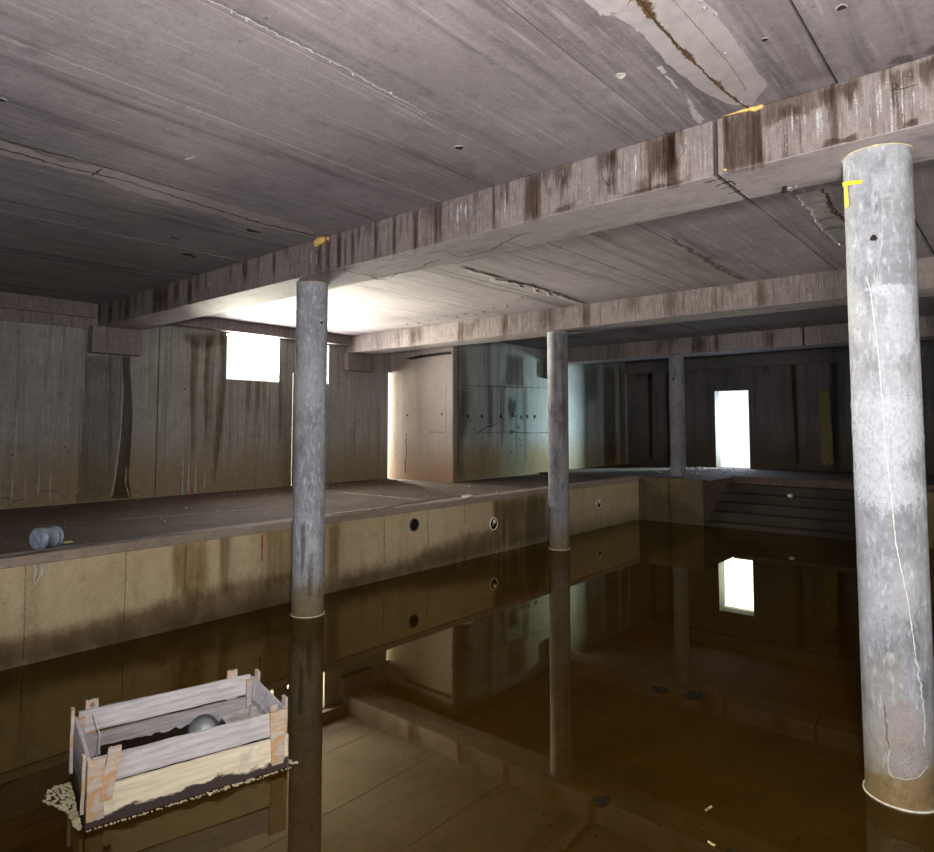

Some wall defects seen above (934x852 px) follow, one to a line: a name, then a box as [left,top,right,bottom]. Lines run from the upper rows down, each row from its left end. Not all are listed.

peeling [584,0,768,106]
damp [657,66,705,124]
damp [772,100,828,152]
damp [847,70,933,132]
crack [0,148,315,236]
peeling [781,185,846,247]
damp [113,357,132,498]
crack [866,194,927,747]